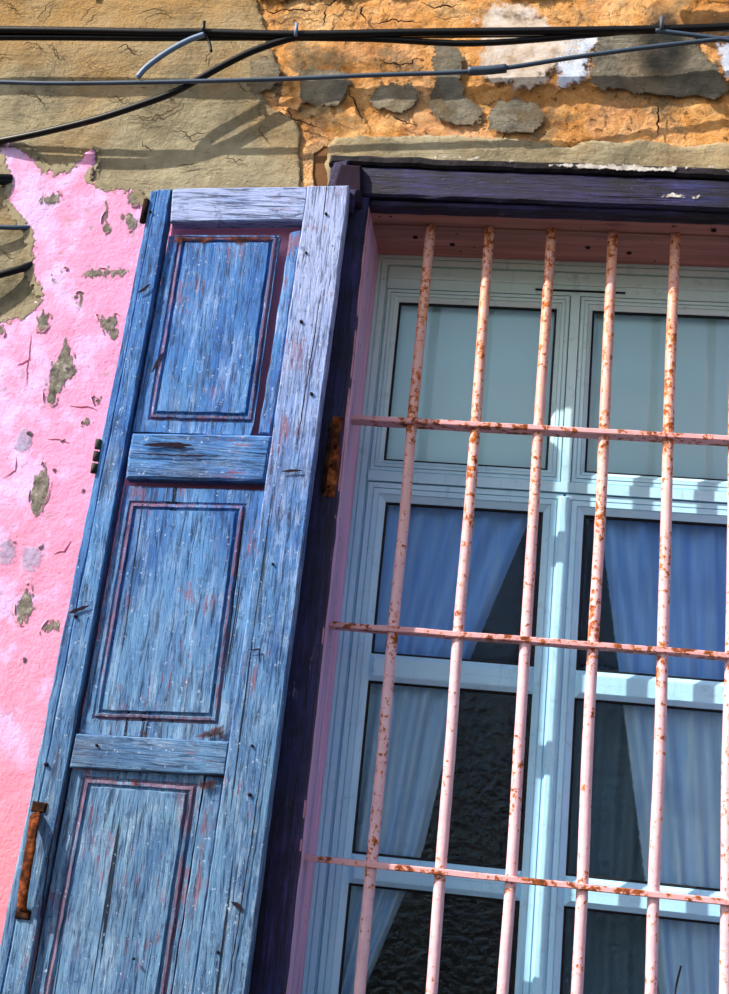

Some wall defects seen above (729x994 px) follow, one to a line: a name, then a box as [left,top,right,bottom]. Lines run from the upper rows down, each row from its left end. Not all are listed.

spalling [247,0,729,187]
peeling [0,142,147,337]
peeling [94,312,119,342]
peeling [41,333,76,407]
peeling [27,460,57,517]
peeling [12,581,35,627]
peeling [39,619,60,635]